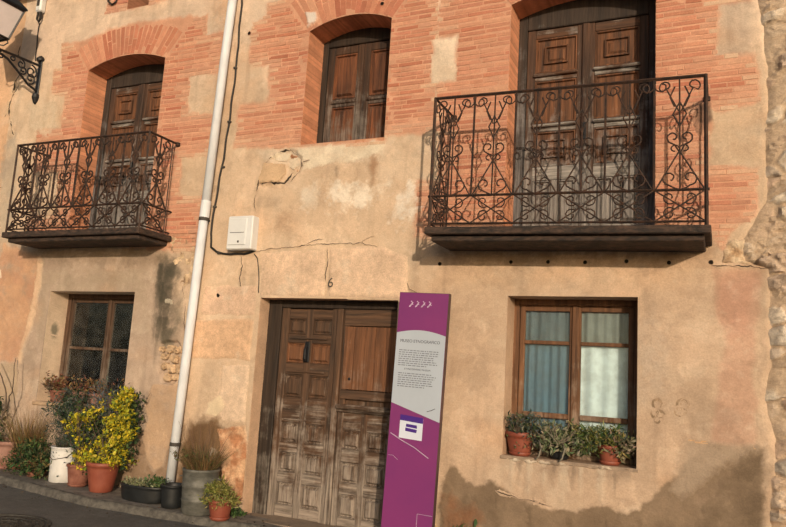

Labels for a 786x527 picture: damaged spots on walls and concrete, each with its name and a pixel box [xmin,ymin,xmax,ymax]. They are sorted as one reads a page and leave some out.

peeling [253,139,387,211]
damp [32,247,188,370]
crack [238,236,378,294]
damp [439,430,777,527]